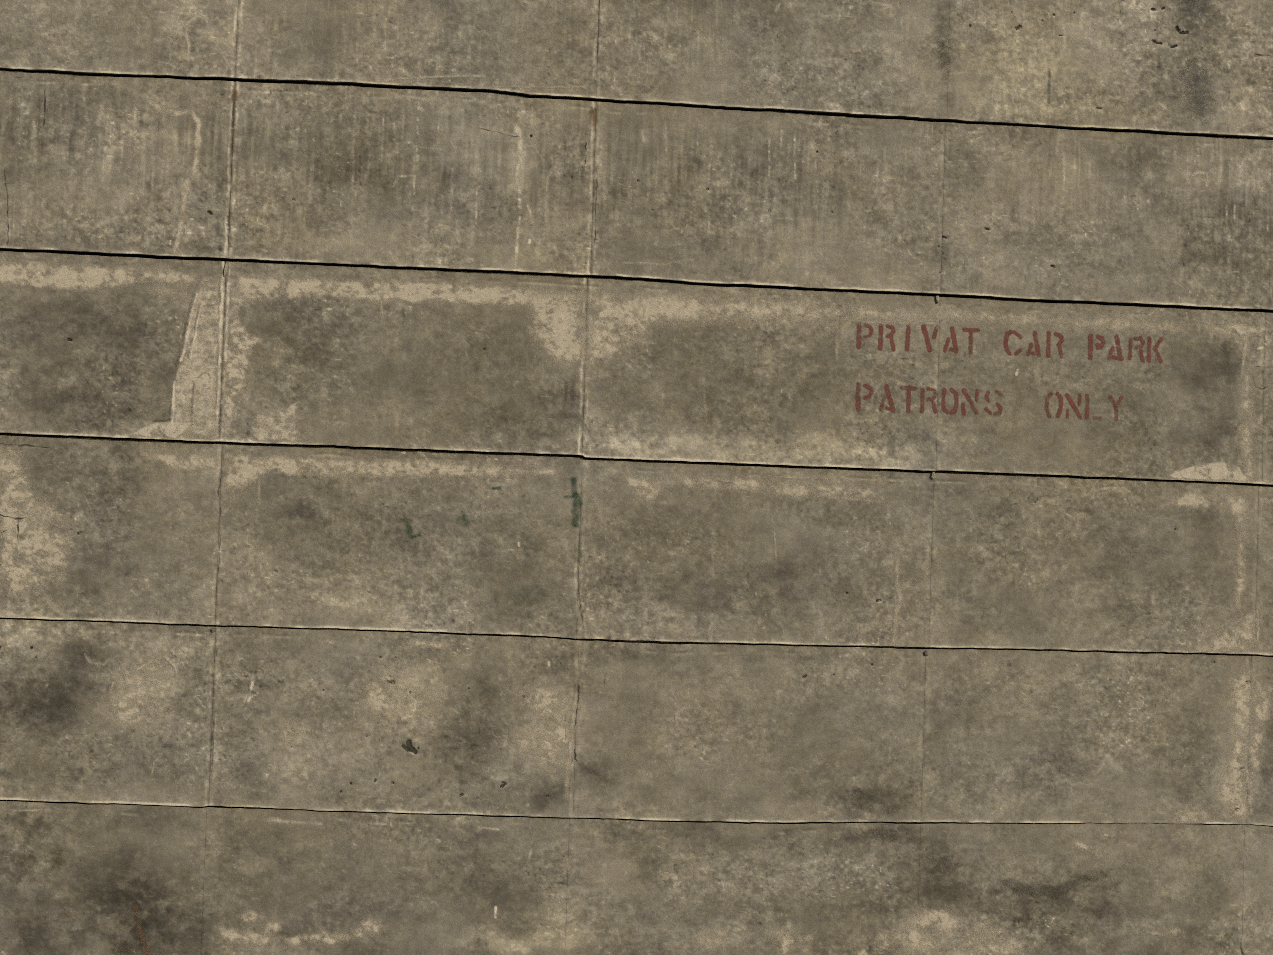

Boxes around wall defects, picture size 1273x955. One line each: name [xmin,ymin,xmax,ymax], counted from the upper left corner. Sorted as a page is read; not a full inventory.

damp [148,98,202,254]
damp [514,125,531,266]
damp [0,261,201,362]
damp [215,276,1173,416]